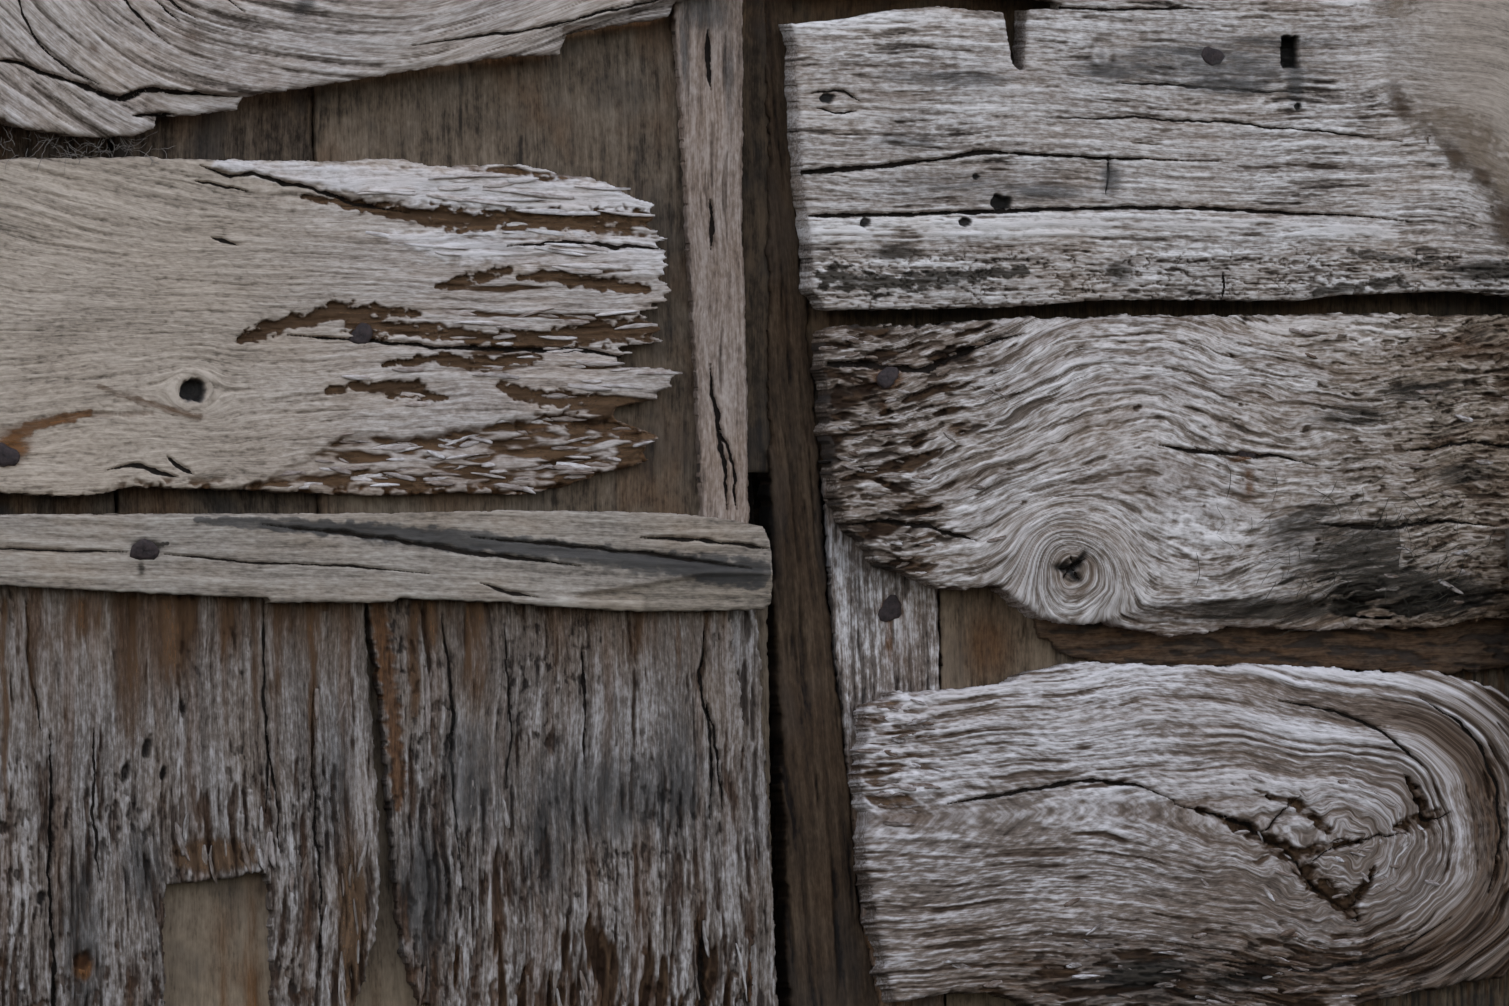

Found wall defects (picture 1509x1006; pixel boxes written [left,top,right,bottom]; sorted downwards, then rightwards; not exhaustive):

crack [290,335,621,358]
corrosion [0,409,93,456]
crack [108,456,192,477]
crack [0,546,121,554]
crack [164,365,767,978]
crack [948,701,1450,910]